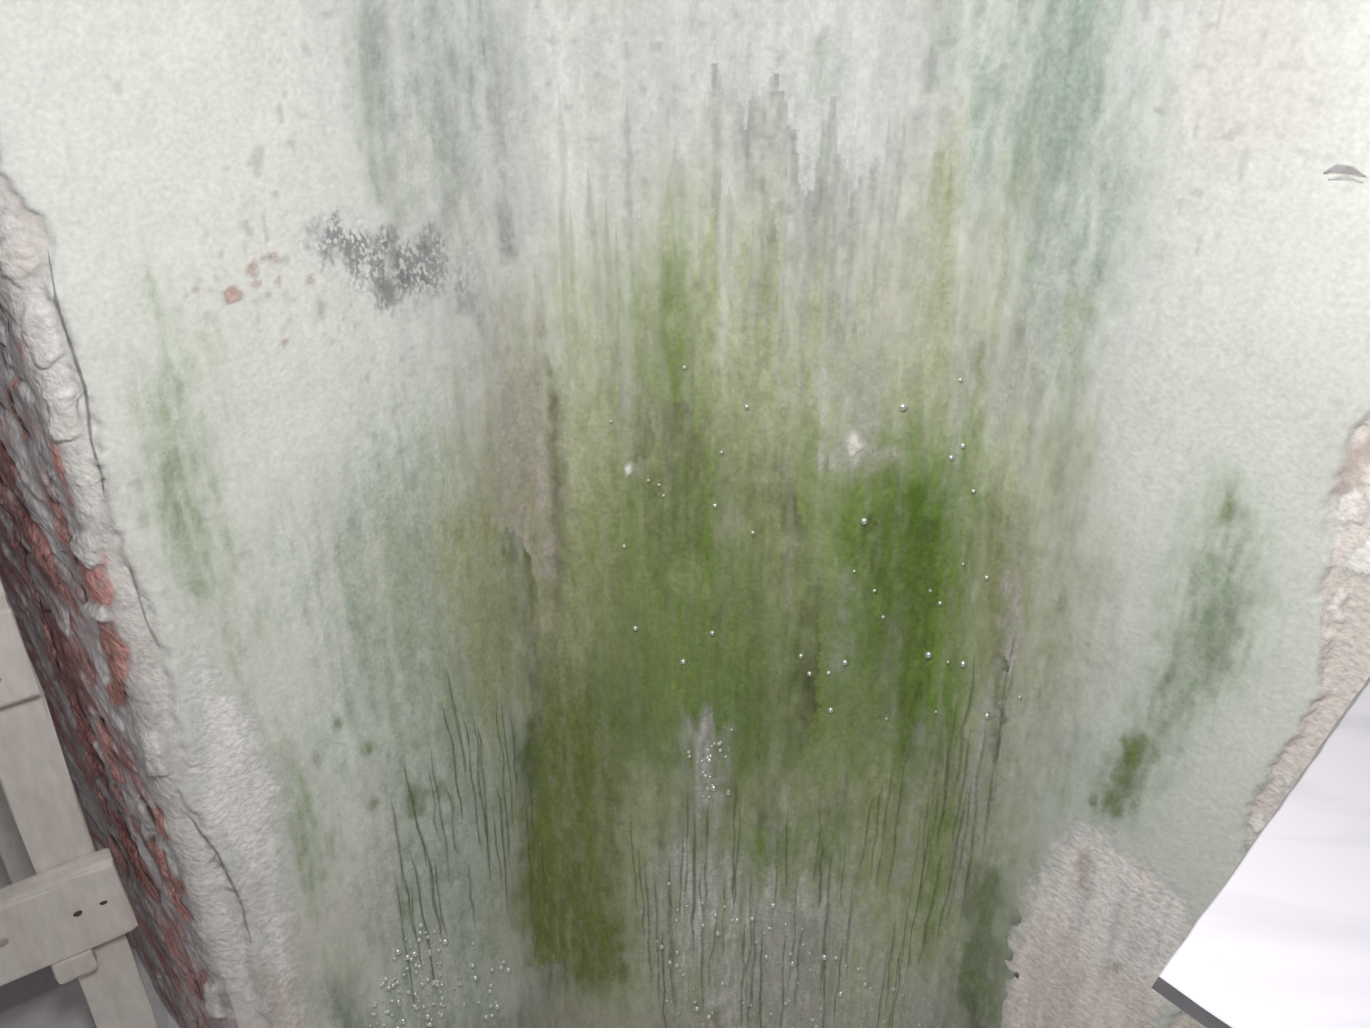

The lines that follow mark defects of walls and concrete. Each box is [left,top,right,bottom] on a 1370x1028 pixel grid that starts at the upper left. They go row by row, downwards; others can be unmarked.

leakage [361,0,506,214]
leakage [927,147,954,321]
leakage [971,0,1111,369]
spalling [1323,165,1366,182]
flaking render [0,194,316,1028]
leakage [299,211,1032,1028]
leakage [1222,500,1234,521]
flaking render [1244,410,1370,848]
leakage [1091,737,1145,816]
peeling [1001,822,1206,1028]